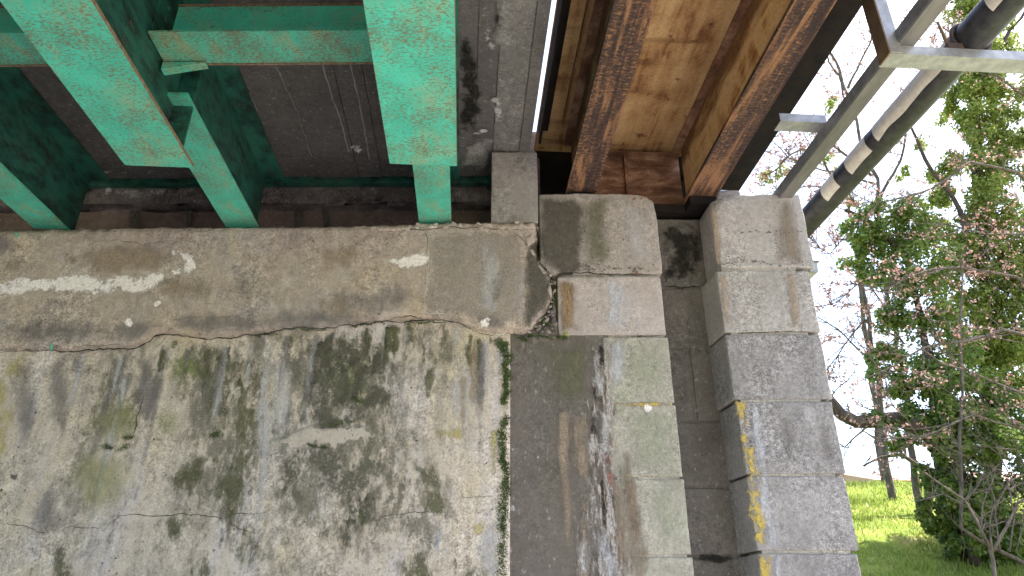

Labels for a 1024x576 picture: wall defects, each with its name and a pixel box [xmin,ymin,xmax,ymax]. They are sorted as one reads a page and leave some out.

leakage [460,0,521,167]
crack [1,226,655,368]
leakage [665,227,701,279]
leakage [94,250,505,576]
leakage [54,550,70,576]